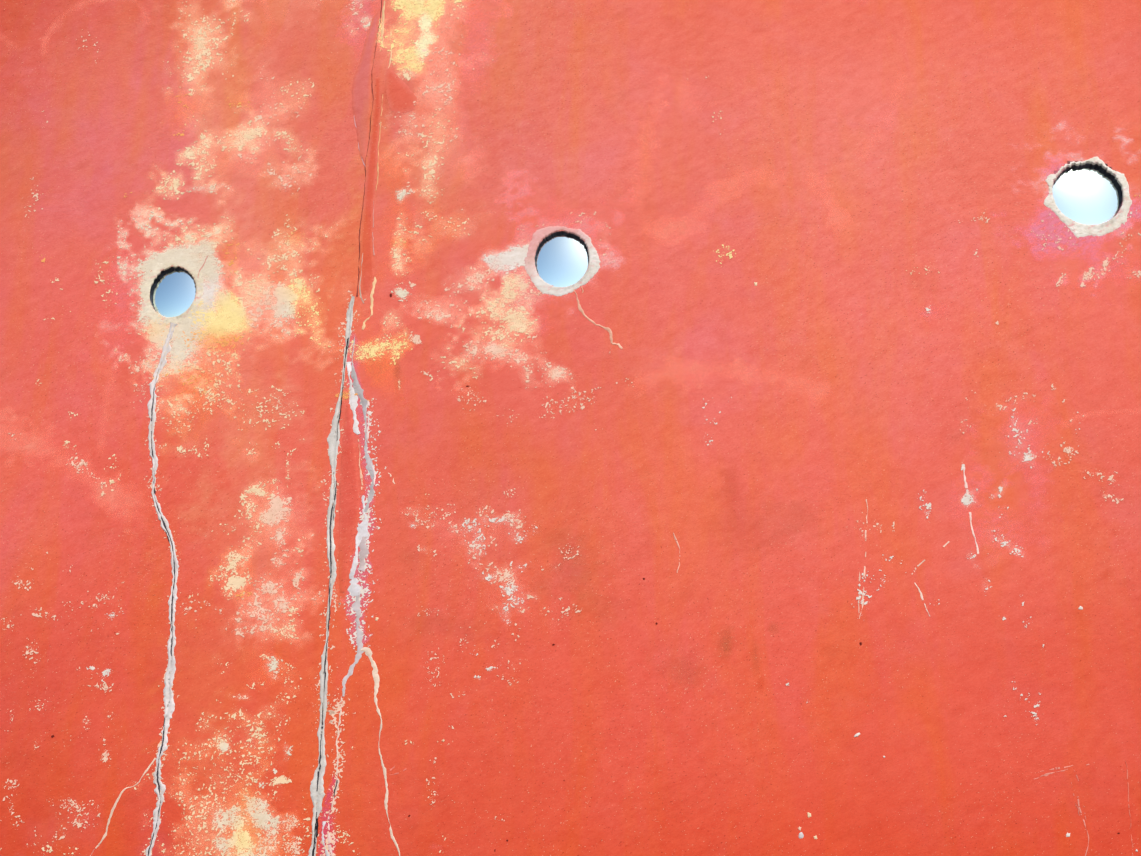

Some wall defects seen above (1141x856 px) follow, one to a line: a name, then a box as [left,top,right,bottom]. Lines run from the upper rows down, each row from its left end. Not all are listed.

crack [90,322,181,856]
peeling [94,0,611,856]
crack [308,0,400,856]